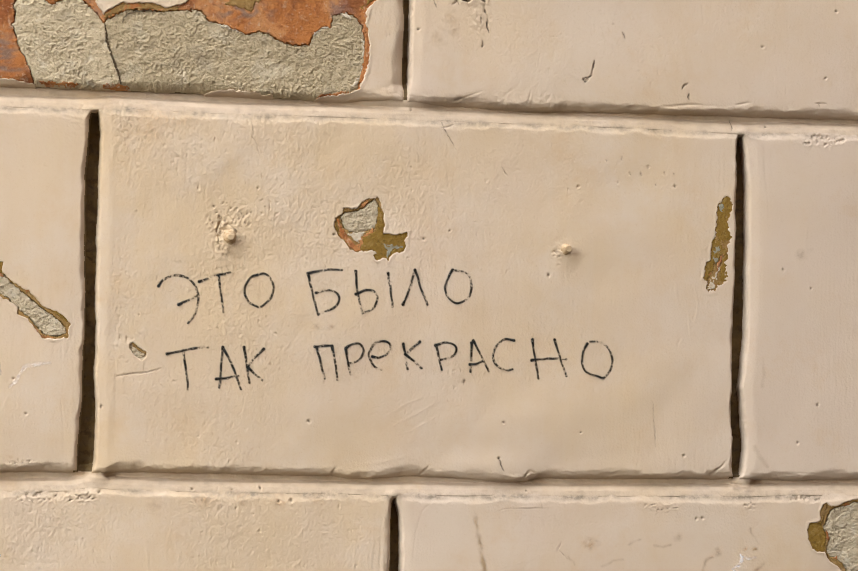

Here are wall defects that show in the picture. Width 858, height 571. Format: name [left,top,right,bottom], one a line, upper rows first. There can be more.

peeling [0,0,376,102]
peeling [334,197,408,261]
peeling [703,196,733,292]
peeling [0,261,71,339]
peeling [807,499,858,571]